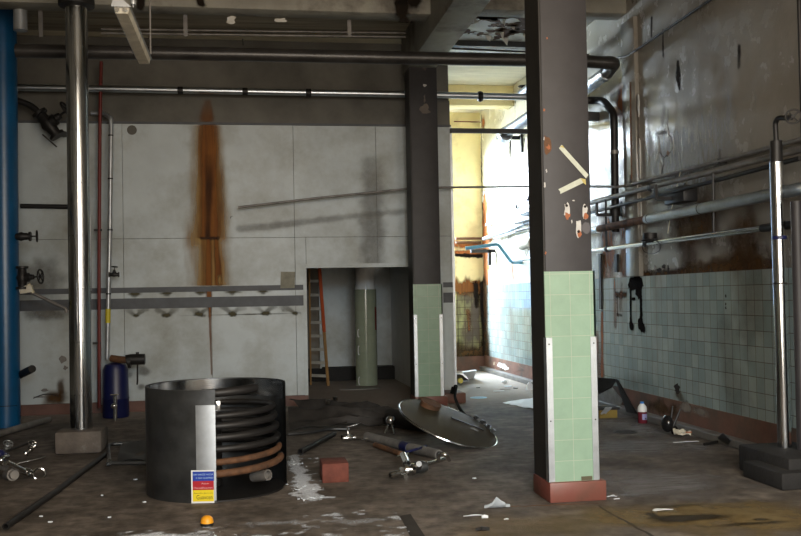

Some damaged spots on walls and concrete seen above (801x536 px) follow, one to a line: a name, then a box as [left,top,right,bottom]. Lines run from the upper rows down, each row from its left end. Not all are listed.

peeling [464,16,525,45]
corrosion [188,111,227,297]
corrosion [454,190,492,285]
water stain [455,277,490,357]